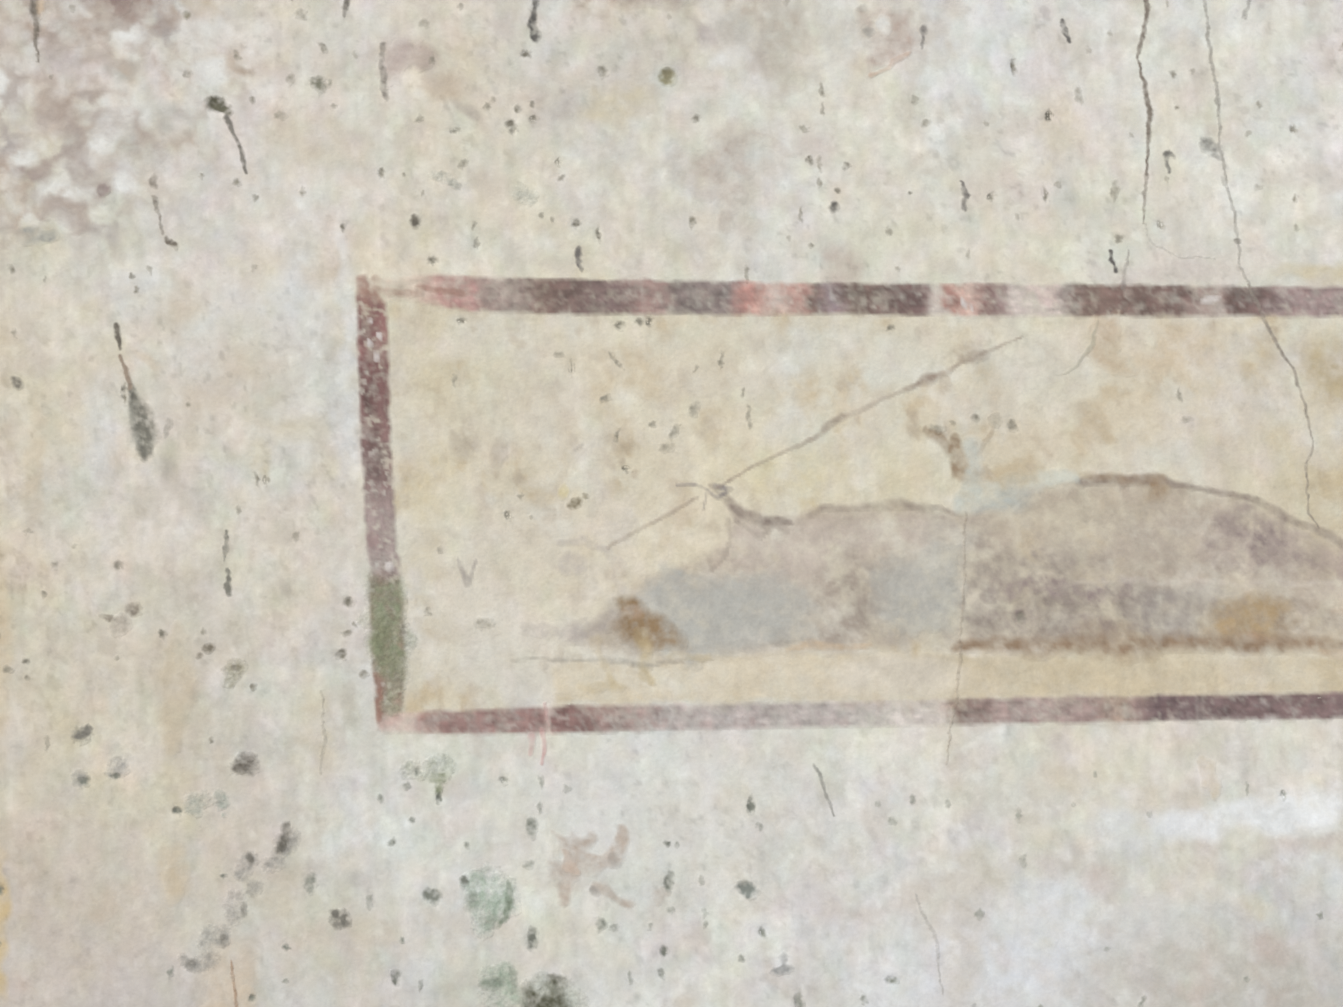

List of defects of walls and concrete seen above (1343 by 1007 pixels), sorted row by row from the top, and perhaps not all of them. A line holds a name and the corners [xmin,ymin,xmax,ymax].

crack [1119,0,1320,529]